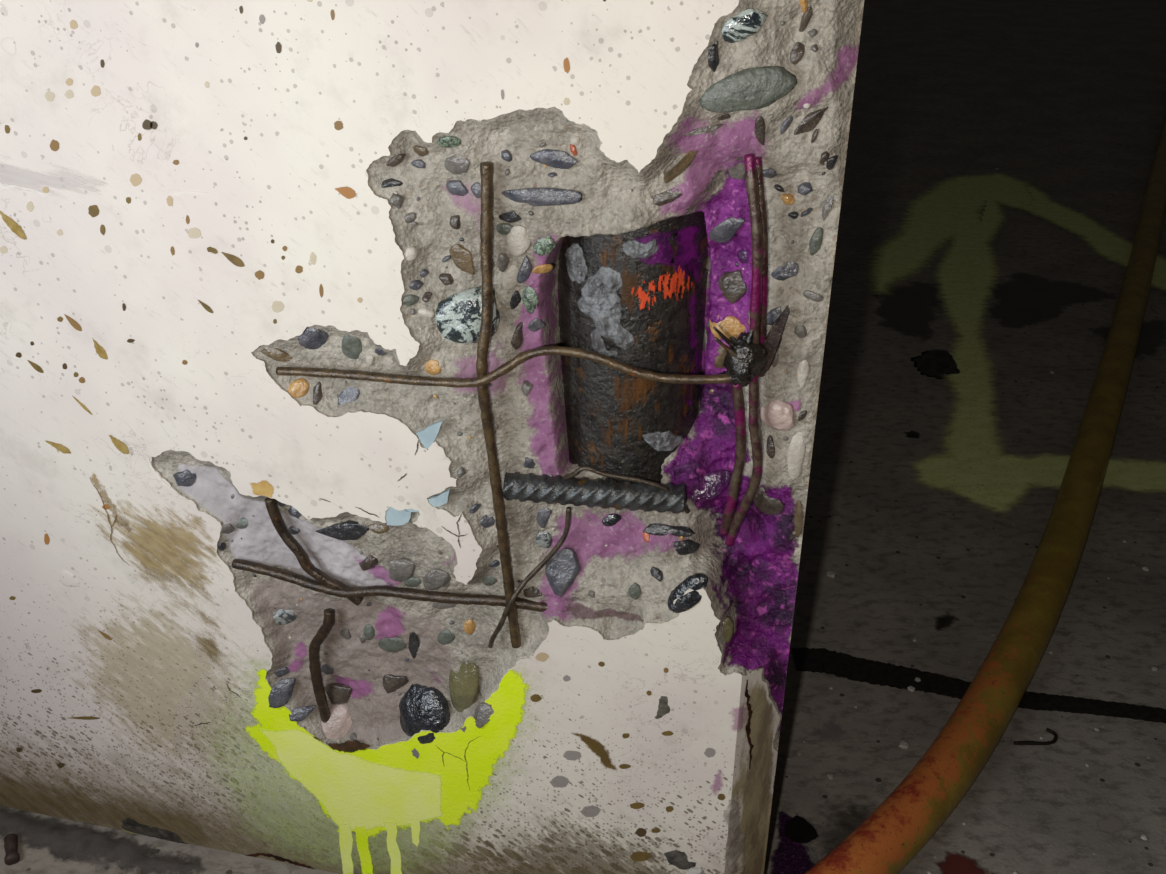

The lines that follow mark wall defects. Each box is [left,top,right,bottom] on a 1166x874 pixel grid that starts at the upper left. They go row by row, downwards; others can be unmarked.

corrosion [600,245,638,312]
spalling [153,0,864,750]
crack [90,479,125,562]
crack [745,680,754,770]